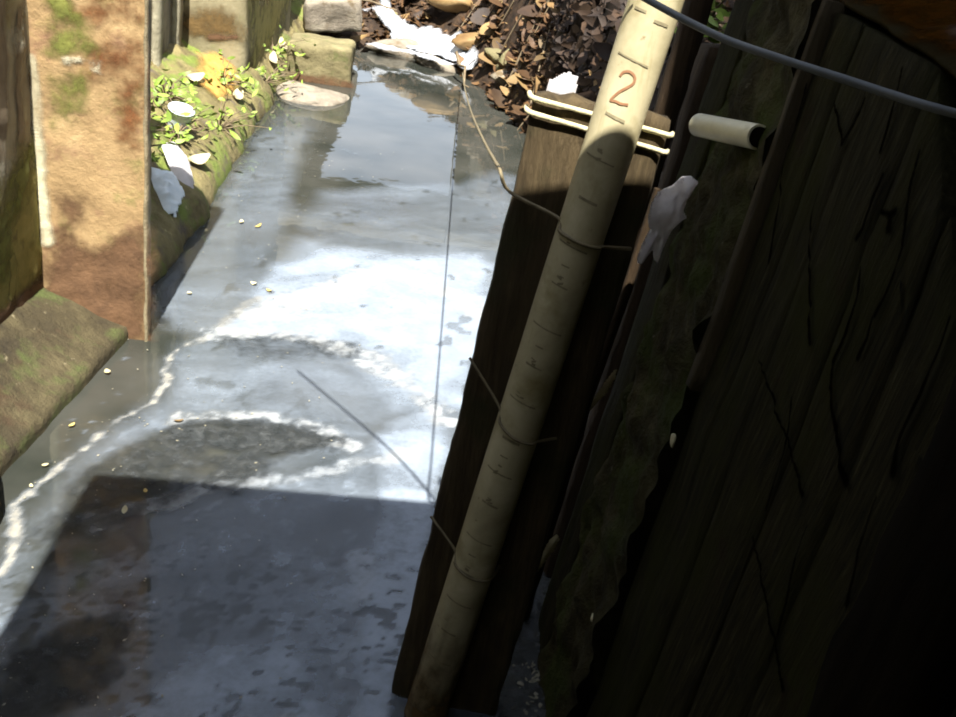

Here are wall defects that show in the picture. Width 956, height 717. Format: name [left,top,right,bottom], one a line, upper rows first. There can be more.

leakage [0,0,152,341]
crack [829,67,920,487]
crack [845,315,951,608]